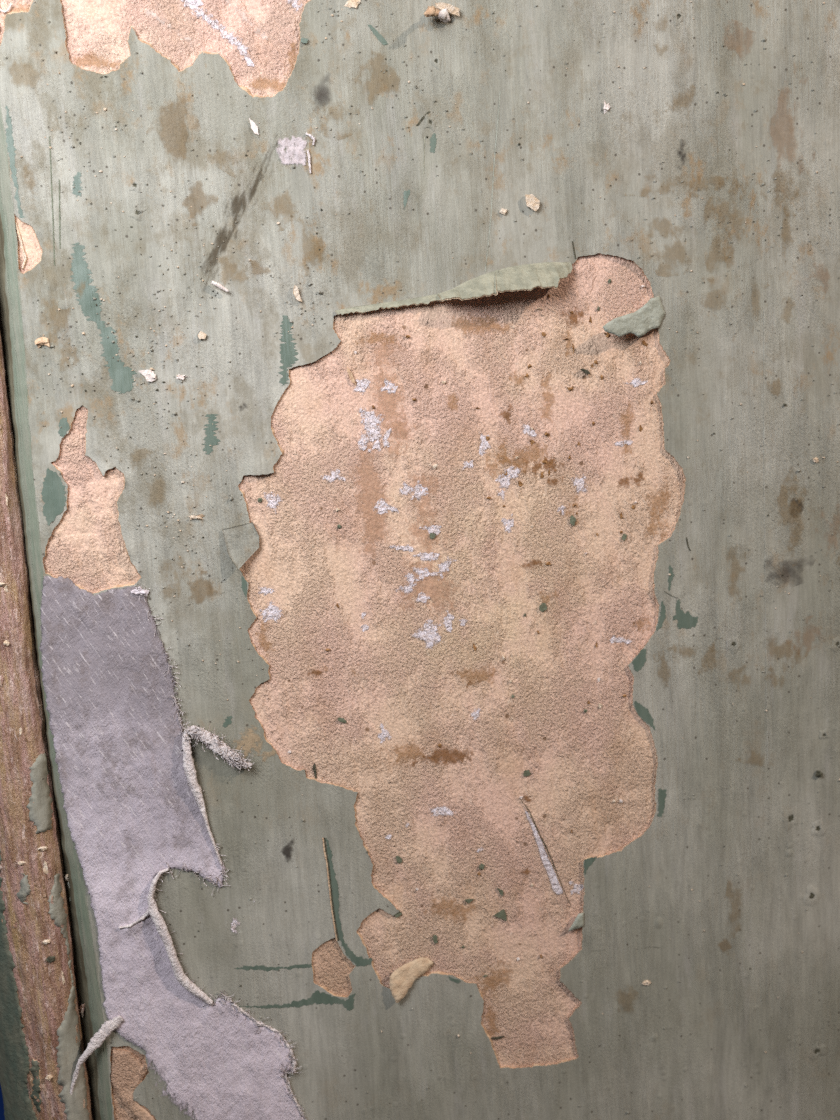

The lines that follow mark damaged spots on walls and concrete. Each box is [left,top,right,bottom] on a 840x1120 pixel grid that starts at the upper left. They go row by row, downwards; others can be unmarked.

peeling [0,0,32,43]
peeling [61,0,310,97]
peeling [43,406,140,593]
peeling [222,253,685,1068]
peeling [110,1046,156,1120]